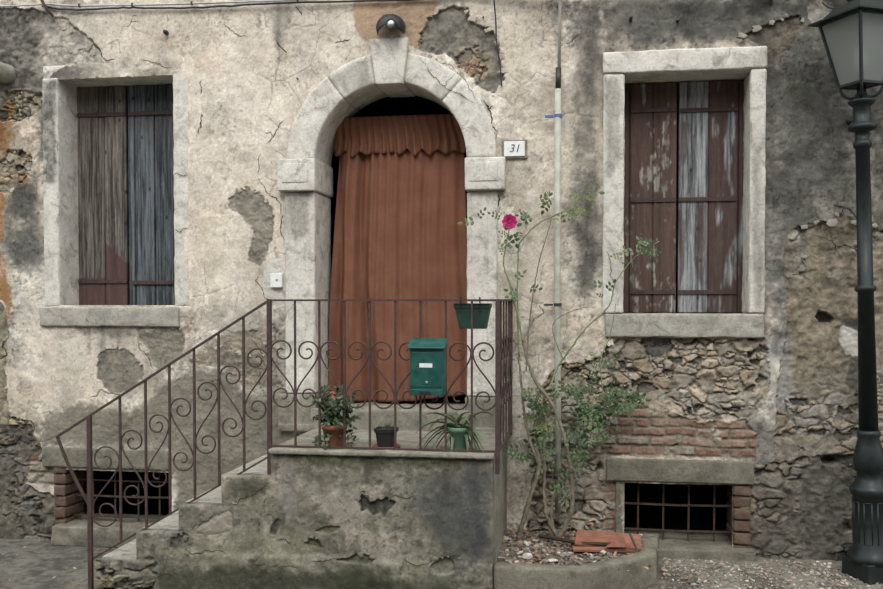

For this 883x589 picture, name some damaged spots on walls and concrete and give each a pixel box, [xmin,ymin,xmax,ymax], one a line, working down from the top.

flaking render [418,5,508,94]
flaking render [737,0,833,65]
crack [418,56,497,138]
flaking render [228,187,274,266]
flaking render [96,325,284,394]
flaking render [773,212,858,463]
flaking render [872,223,883,447]
flaking render [26,447,66,519]
flaking render [303,526,340,547]
flaking render [354,493,395,517]
crack [404,555,465,566]